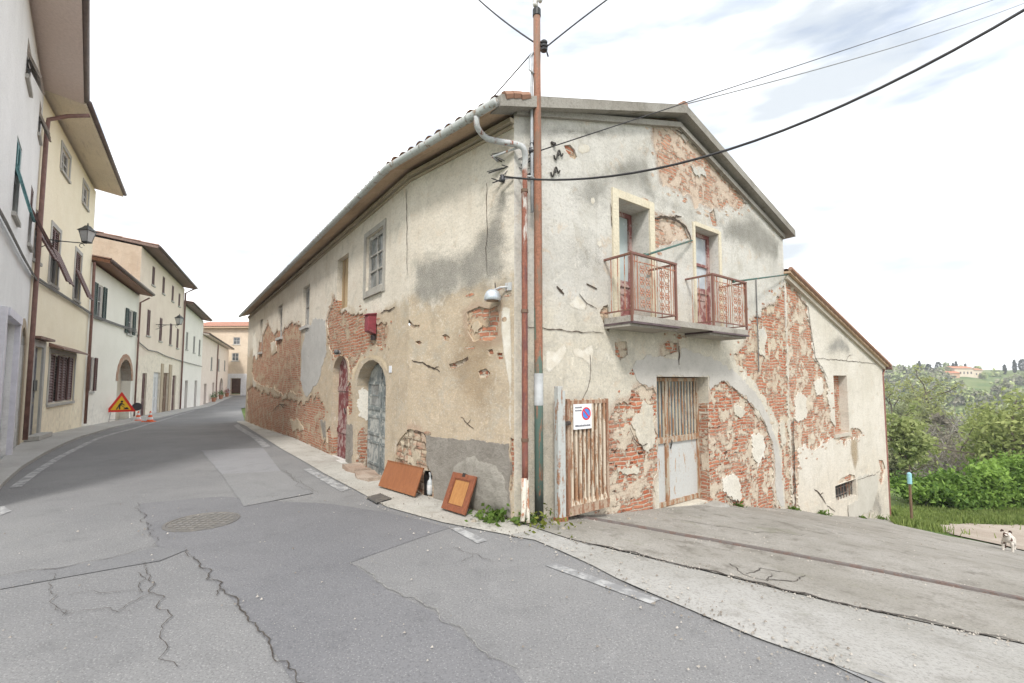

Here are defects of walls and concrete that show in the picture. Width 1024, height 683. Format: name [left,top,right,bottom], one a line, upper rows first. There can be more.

flaking render [645,127,753,255]
flaking render [248,320,338,454]
flaking render [326,297,392,467]
spalling [396,422,434,497]
flaking render [443,287,512,368]
crack [529,283,601,398]
flaking render [594,369,659,515]
flaking render [697,280,865,509]
crack [4,508,177,666]
crack [185,549,302,683]